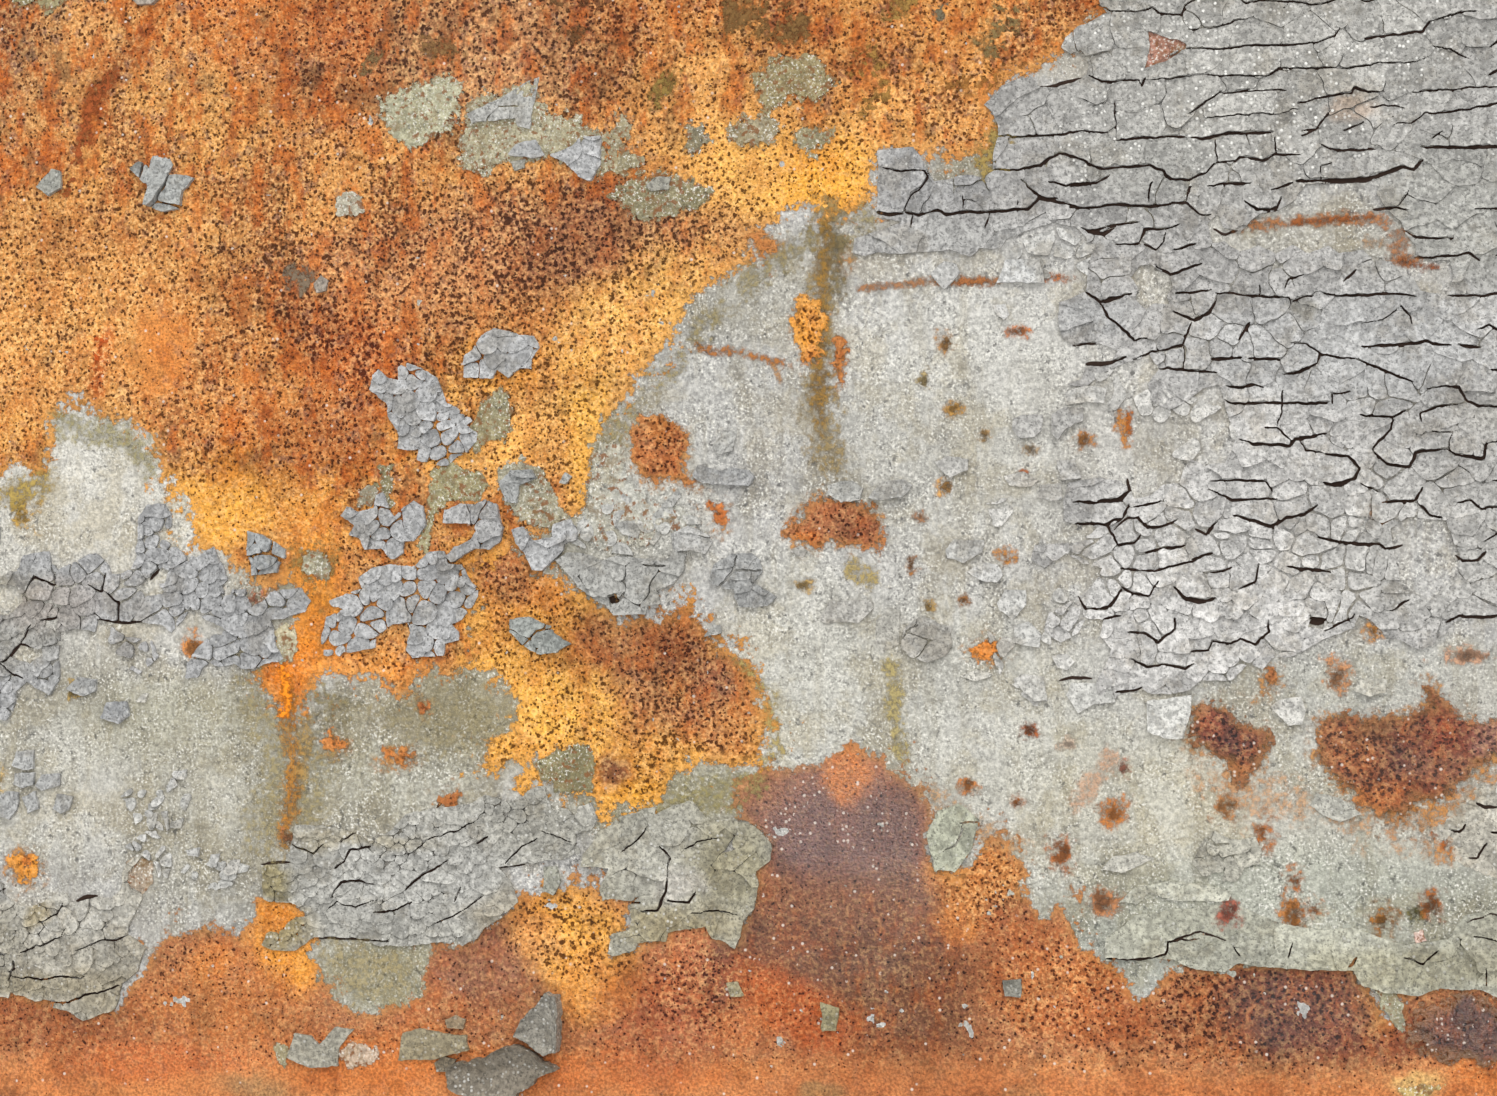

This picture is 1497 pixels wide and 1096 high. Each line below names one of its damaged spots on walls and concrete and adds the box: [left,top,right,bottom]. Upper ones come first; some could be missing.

peeling [369,363,477,466]
corrosion [857,276,1000,292]
crack [853,0,1497,693]
corrosion [1234,210,1439,270]
peeling [0,503,311,724]
peeling [321,469,777,658]
corrosion [780,490,888,589]
peeling [946,369,1497,739]
corrosion [1185,666,1306,855]
corrosion [1310,652,1497,864]
peeling [0,769,772,1021]
peeling [398,991,563,1096]